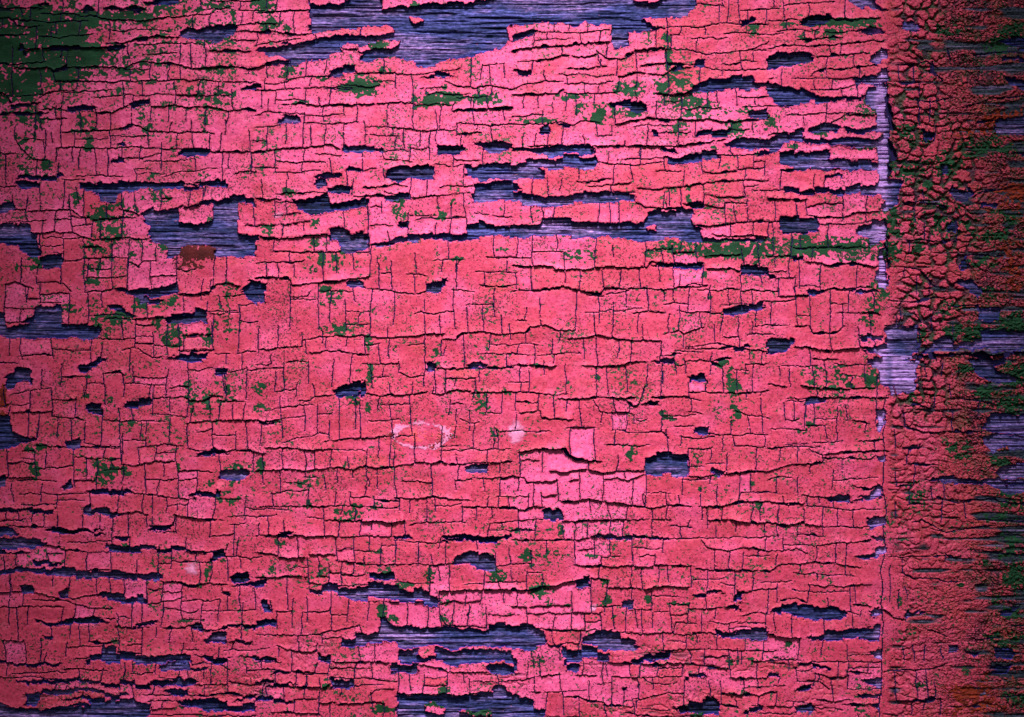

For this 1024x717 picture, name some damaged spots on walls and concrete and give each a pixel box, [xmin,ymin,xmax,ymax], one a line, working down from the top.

damp [0,0,237,177]
peeling [80,179,259,258]
peeling [293,167,369,215]
crack [0,0,884,324]
peeling [257,0,696,79]
peeling [330,124,765,254]
peeling [652,49,903,294]
damp [644,119,1024,329]
crack [0,147,889,717]
peeling [341,617,670,717]
peeling [772,602,882,659]
crack [795,554,981,717]